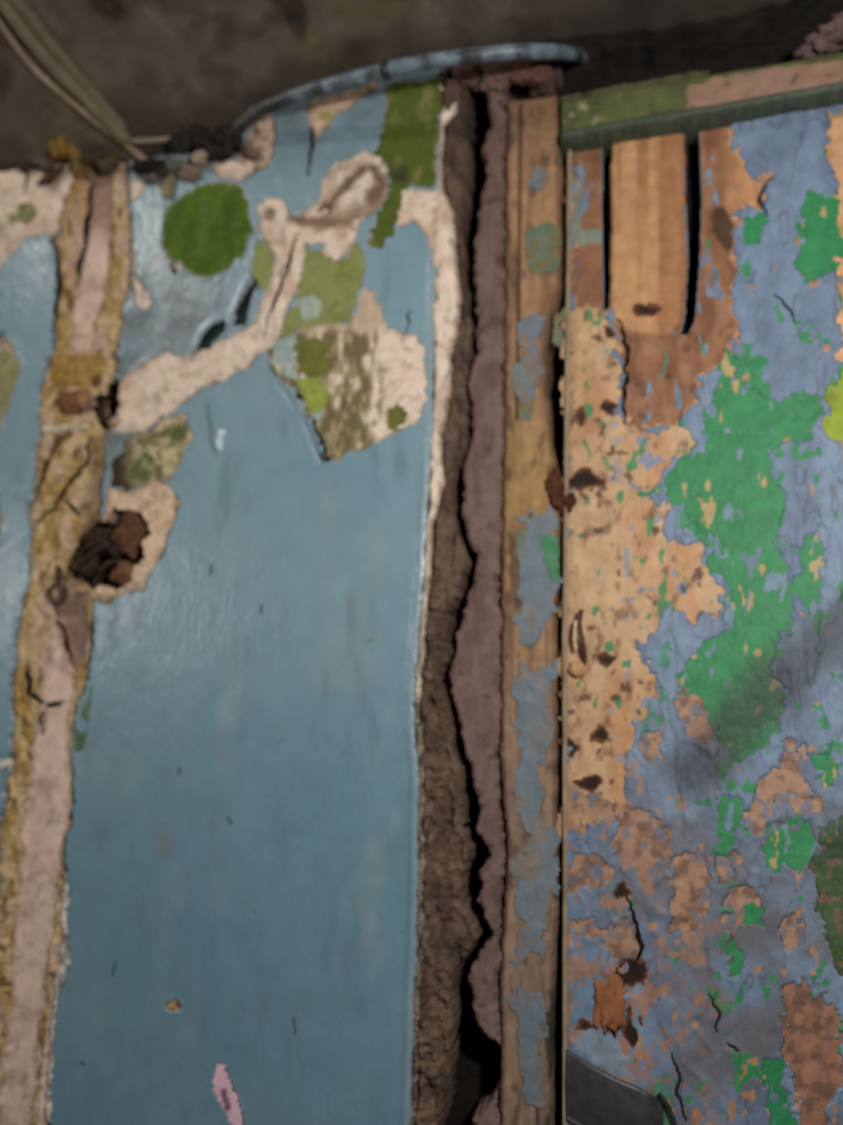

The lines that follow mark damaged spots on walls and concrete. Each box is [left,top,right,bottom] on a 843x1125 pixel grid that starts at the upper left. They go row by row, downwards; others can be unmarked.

crack [34,434,91,524]
flaking render [0,60,554,1125]
peeling [509,109,843,987]
spalling [575,1017,593,1030]
spalling [621,1004,643,1047]
peeling [757,977,843,1125]